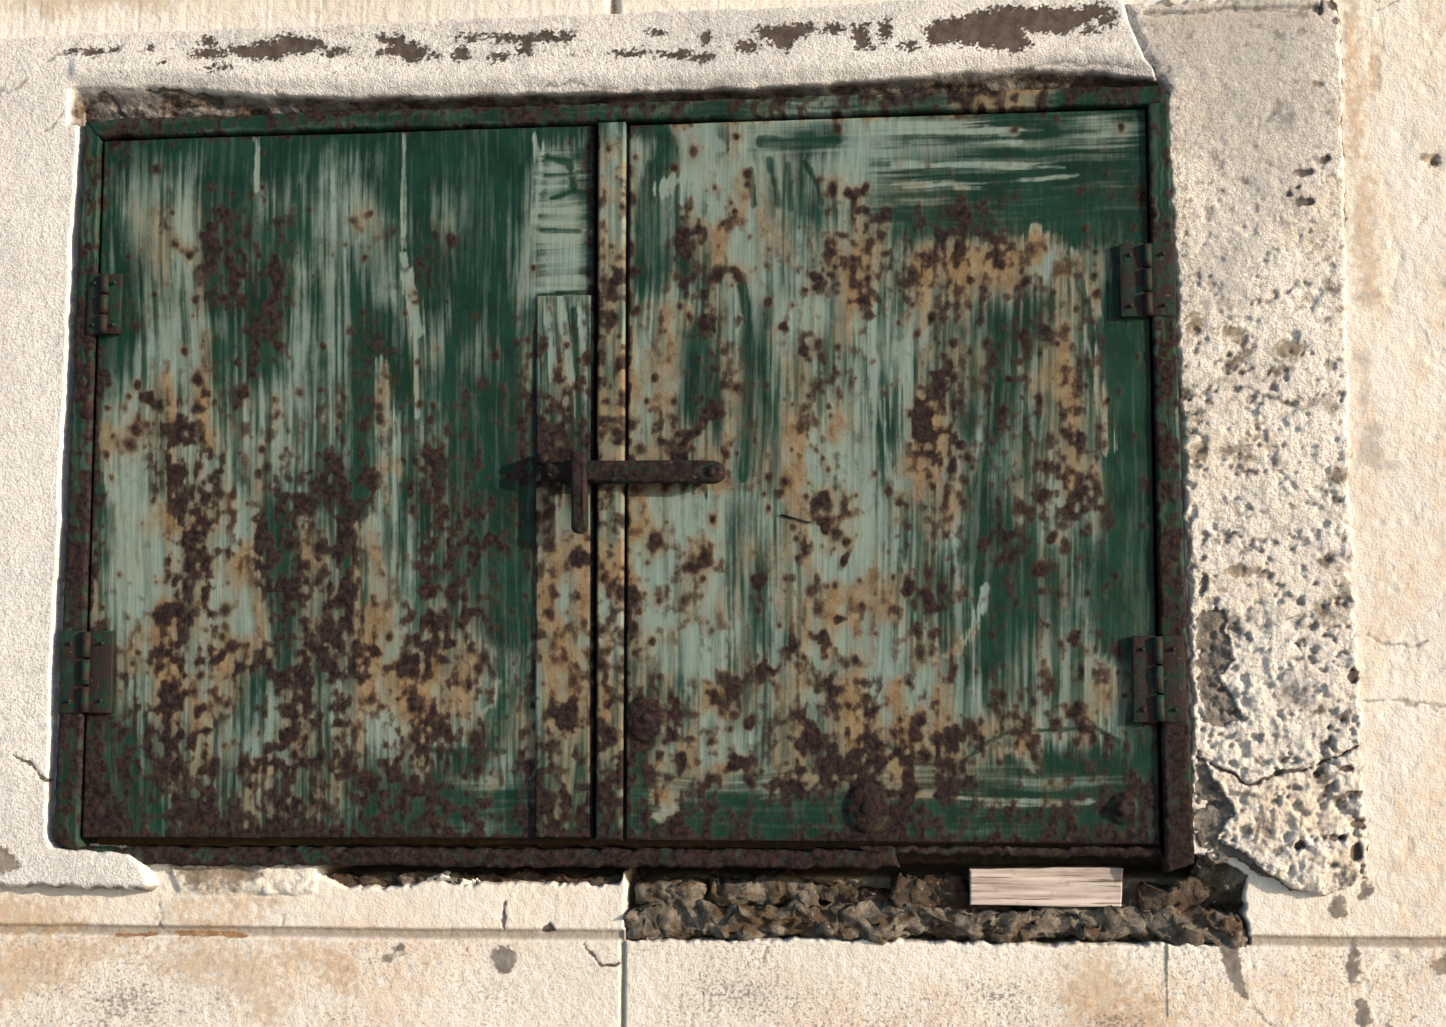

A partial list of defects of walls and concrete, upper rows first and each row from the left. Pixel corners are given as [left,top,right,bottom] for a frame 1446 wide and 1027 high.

peeling [64,45,122,58]
peeling [187,31,353,73]
peeling [375,28,585,66]
peeling [607,27,716,65]
peeling [733,1,1120,56]
flaking render [1195,573,1244,727]
crack [1210,745,1360,786]
peeling [0,846,22,876]
spalling [329,750,1260,949]